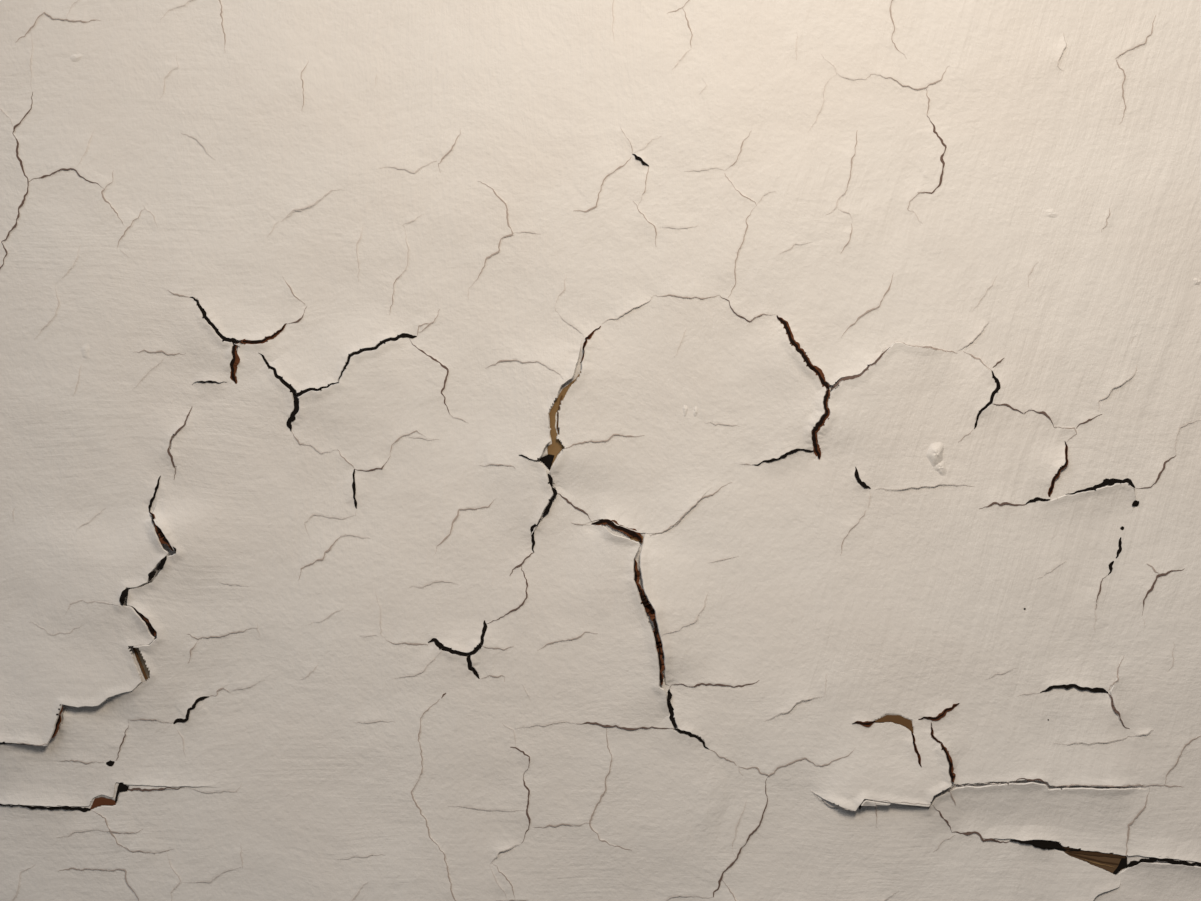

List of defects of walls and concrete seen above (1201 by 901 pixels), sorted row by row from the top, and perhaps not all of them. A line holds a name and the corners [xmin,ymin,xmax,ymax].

peeling [0,401,273,813]
crack [32,215,468,680]
peeling [158,283,427,458]
crack [270,189,345,233]
crack [355,129,1201,901]
peeling [795,652,1201,901]